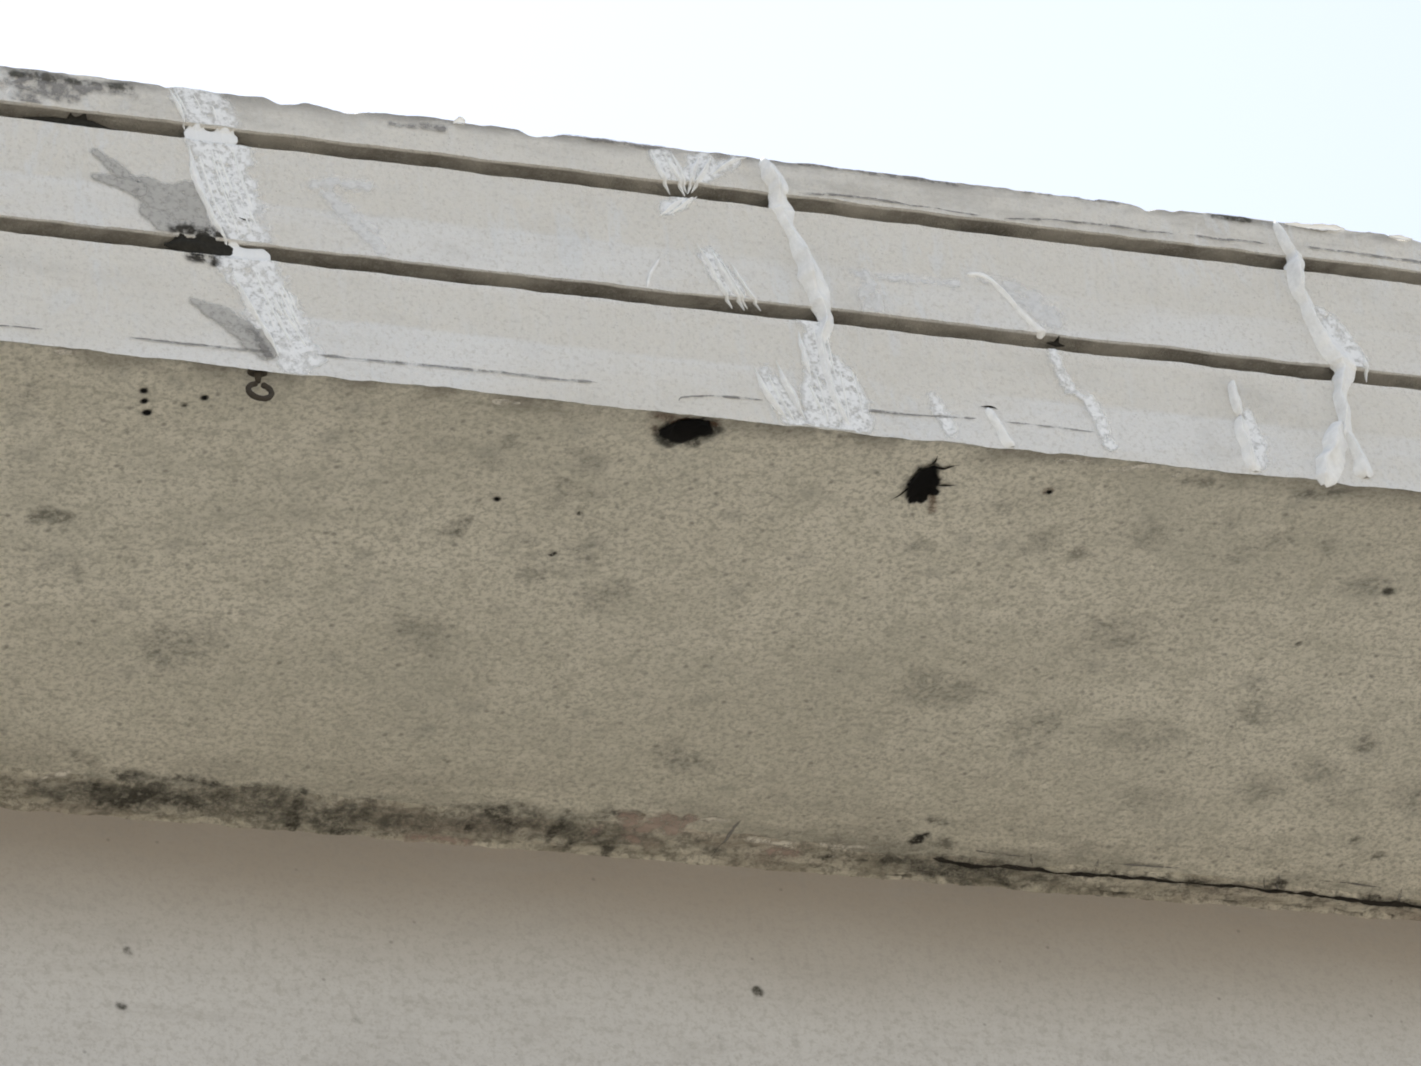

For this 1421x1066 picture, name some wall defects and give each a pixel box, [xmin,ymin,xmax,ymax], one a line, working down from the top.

crack [136,338,268,352]
crack [317,354,592,382]
crack [679,393,760,401]
crack [868,405,1092,432]
water stain [42,770,517,845]
water stain [535,815,614,857]
water stain [883,818,1002,885]
crack [933,850,1421,909]